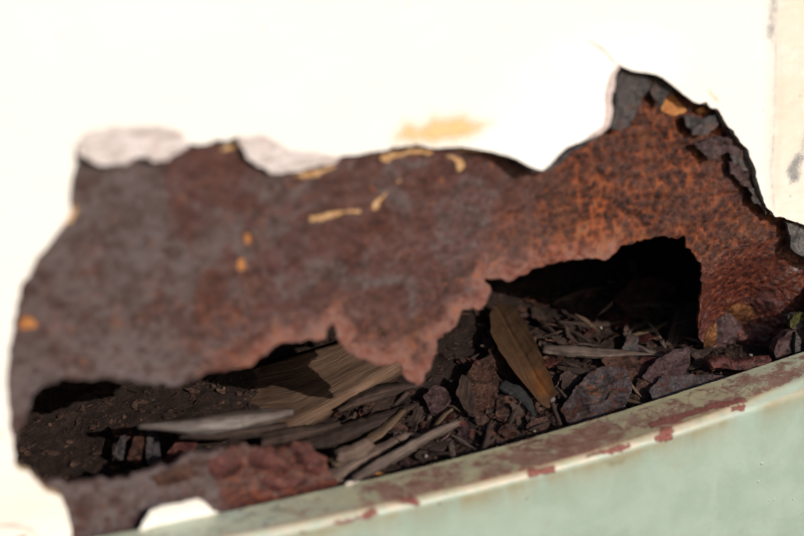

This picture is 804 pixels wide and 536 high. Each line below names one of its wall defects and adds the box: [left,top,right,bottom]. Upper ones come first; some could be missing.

peeling [649,76,677,107]
peeling [76,125,189,166]
peeling [235,134,340,174]
peeling [513,135,599,173]
peeling [693,109,770,214]
peeling [784,220,804,256]
rust [6,89,804,466]
rust [31,424,338,536]
rust [527,465,556,477]
peeling [139,498,220,531]
rust [330,507,377,525]
rust [397,495,420,506]